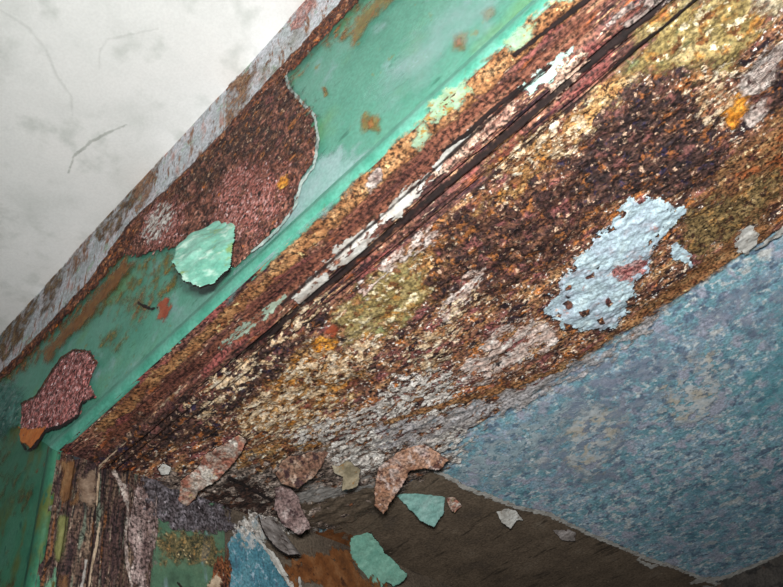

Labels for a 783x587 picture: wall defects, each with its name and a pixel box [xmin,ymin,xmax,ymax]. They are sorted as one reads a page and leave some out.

peeling [18,348,98,451]
corrosion [0,158,195,385]
corrosion [60,0,783,507]
peeling [112,46,783,587]
crack [235,0,696,359]
peeling [80,522,101,587]
corrosion [207,549,232,587]